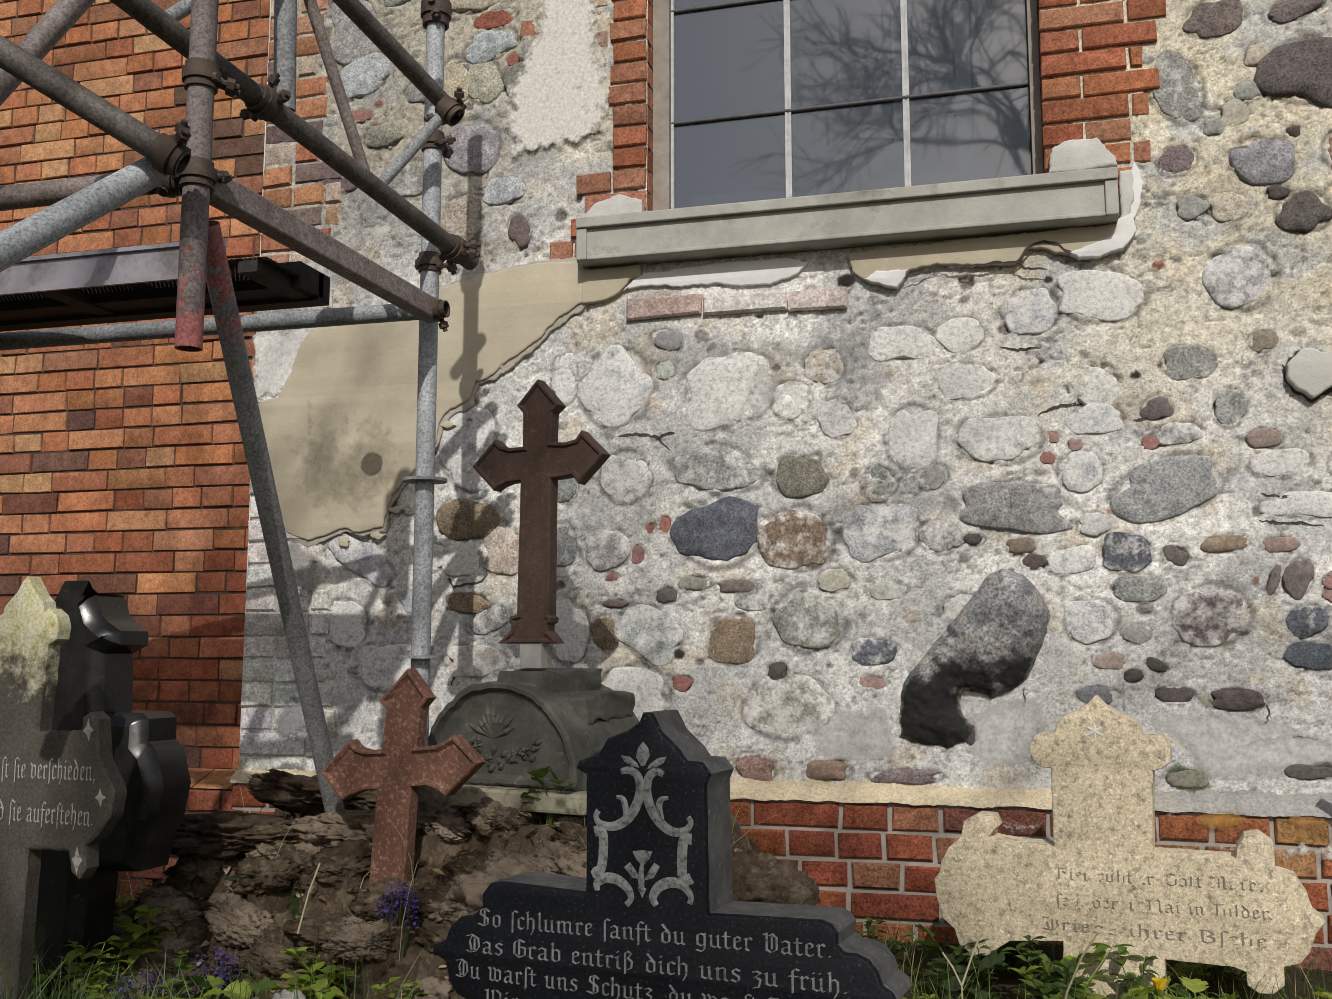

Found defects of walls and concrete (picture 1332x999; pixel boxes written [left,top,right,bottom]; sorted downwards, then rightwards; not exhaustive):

peeling [507,0,610,155]
spalling [838,161,1144,290]
flaking render [435,257,809,450]
flaking render [1285,348,1332,400]
flaking render [253,320,419,596]
leakage [348,446,382,476]